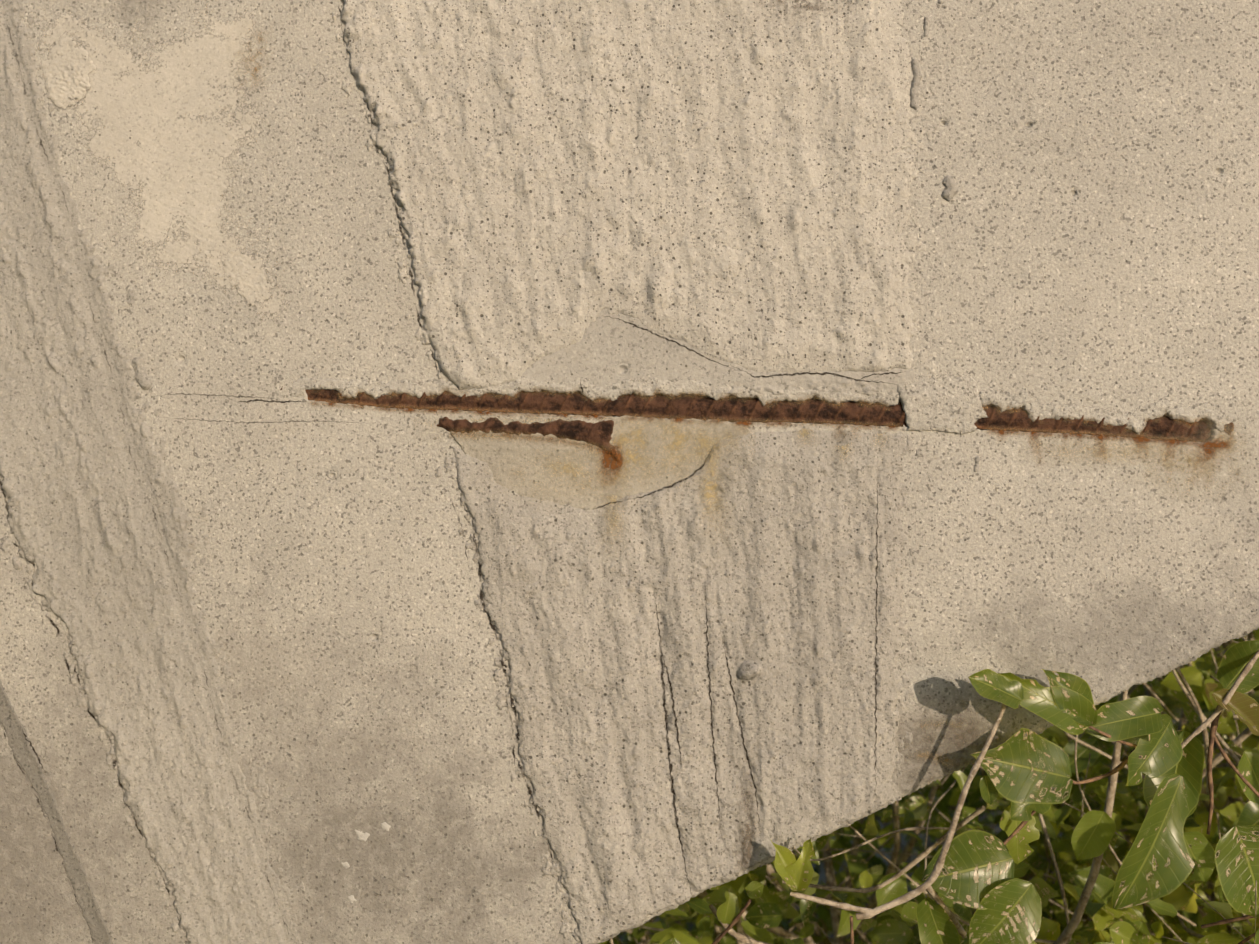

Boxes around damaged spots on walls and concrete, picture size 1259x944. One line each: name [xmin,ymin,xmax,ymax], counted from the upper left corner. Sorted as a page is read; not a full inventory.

crack [606,316,906,385]
spalling [289,309,1229,435]
corrosion [548,438,623,480]
spalling [450,415,750,510]
crack [593,445,714,509]
corrosion [990,421,1234,465]
crack [654,596,691,893]
crack [705,588,761,837]